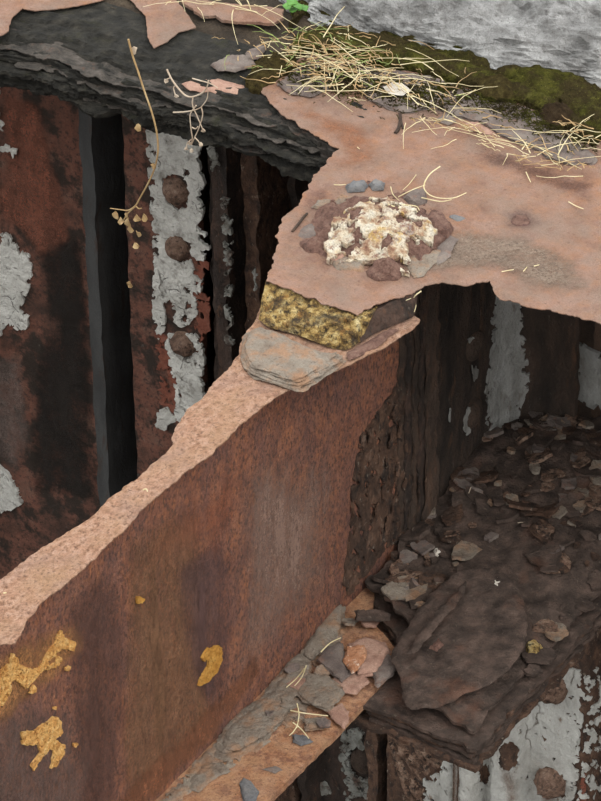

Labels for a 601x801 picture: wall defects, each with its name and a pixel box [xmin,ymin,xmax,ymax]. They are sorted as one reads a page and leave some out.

peeling [0,143,18,159]
peeling [0,232,33,336]
peeling [145,130,221,431]
peeling [220,196,235,345]
corrosion [34,242,93,496]
peeling [471,296,530,431]
peeling [0,464,24,513]
corrosion [182,546,226,706]
corrosion [0,632,78,801]
corrosion [239,778,259,801]
peeling [338,728,369,801]
peeling [388,667,601,801]